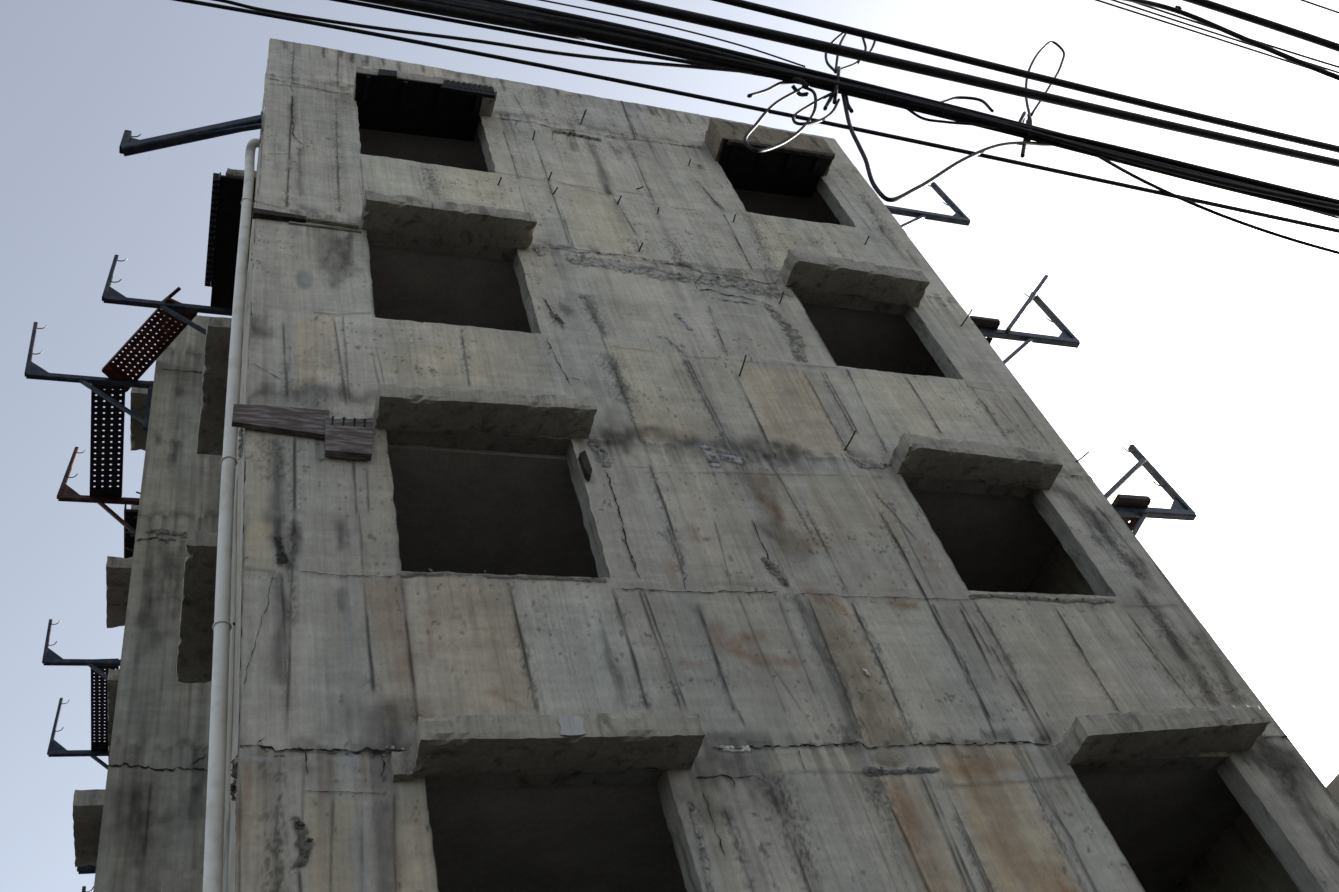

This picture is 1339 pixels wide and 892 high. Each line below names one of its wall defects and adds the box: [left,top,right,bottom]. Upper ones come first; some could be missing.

spalling [565,242,808,362]
crack [236,570,392,684]
crack [109,715,405,794]
spalling [292,817,313,868]